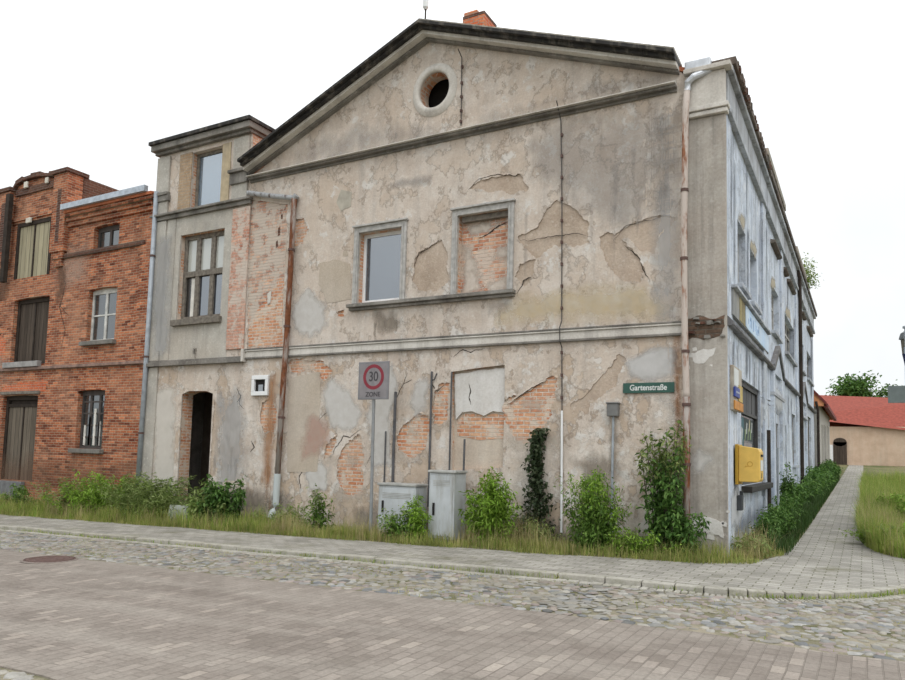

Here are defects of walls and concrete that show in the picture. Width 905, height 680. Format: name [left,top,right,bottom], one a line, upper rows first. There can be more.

flaking render [469,171,529,195]
flaking render [248,200,325,349]
flaking render [413,240,450,293]
flaking render [515,201,677,286]
flaking render [255,380,277,437]
flaking render [289,358,558,498]